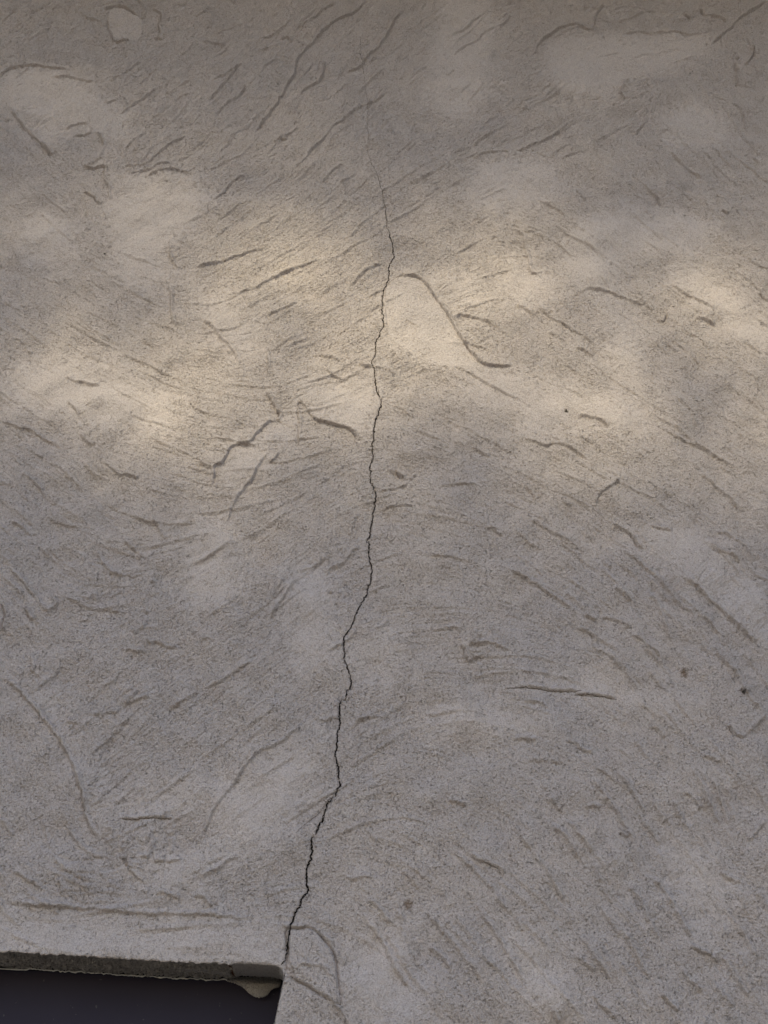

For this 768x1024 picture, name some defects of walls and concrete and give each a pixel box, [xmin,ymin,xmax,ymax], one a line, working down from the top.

crack [281,101,395,978]